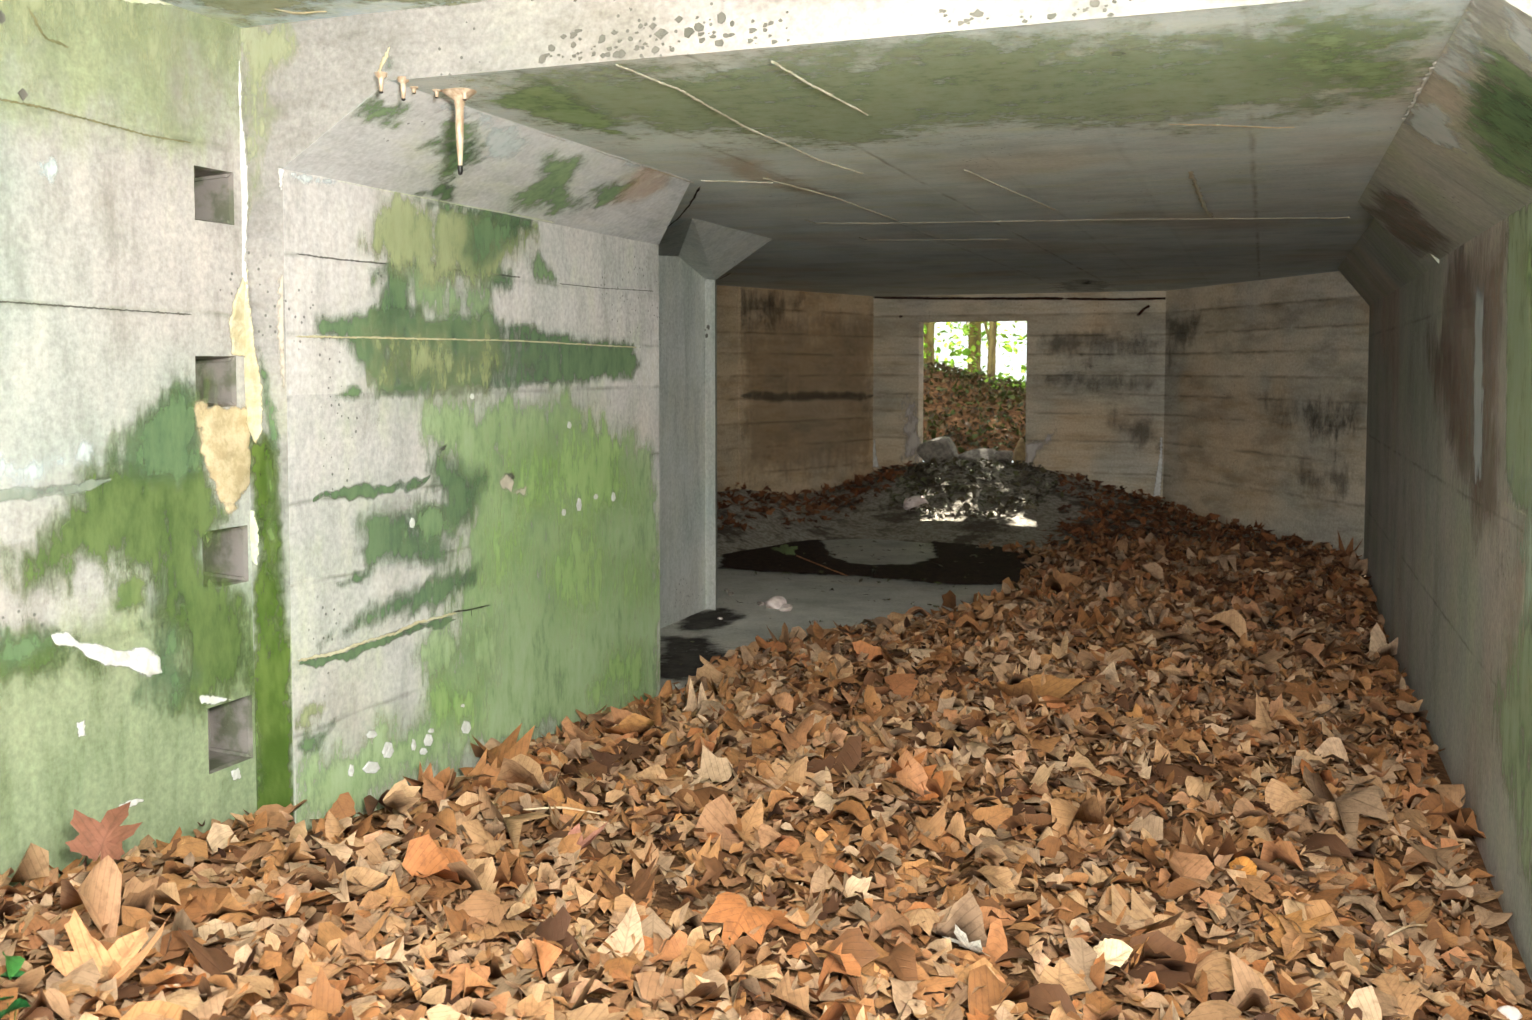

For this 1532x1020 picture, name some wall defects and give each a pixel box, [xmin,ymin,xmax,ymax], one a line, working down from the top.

damp [1402,10,1532,154]
damp [372,85,637,319]
damp [1429,239,1532,637]
damp [313,475,455,544]
damp [562,492,616,516]
damp [110,574,147,612]
damp [0,626,231,709]
damp [299,617,456,669]
damp [77,720,86,737]
damp [231,719,263,785]
damp [348,728,434,777]
damp [461,704,471,734]